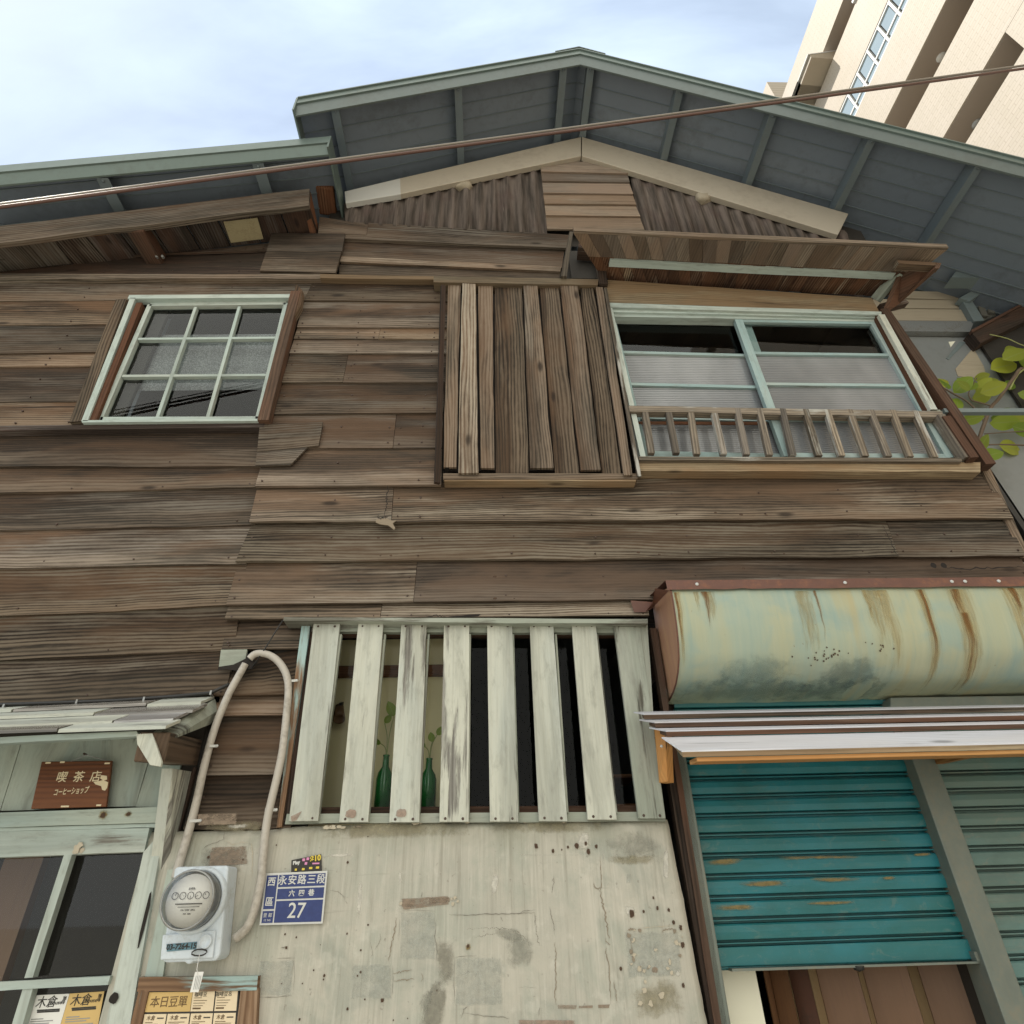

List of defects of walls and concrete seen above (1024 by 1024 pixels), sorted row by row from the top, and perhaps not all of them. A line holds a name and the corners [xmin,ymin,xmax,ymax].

rust [919,589,937,642]
rust [951,589,975,684]
crack [449,878,557,1010]
crack [594,862,617,1001]
peeling [627,925,683,1009]